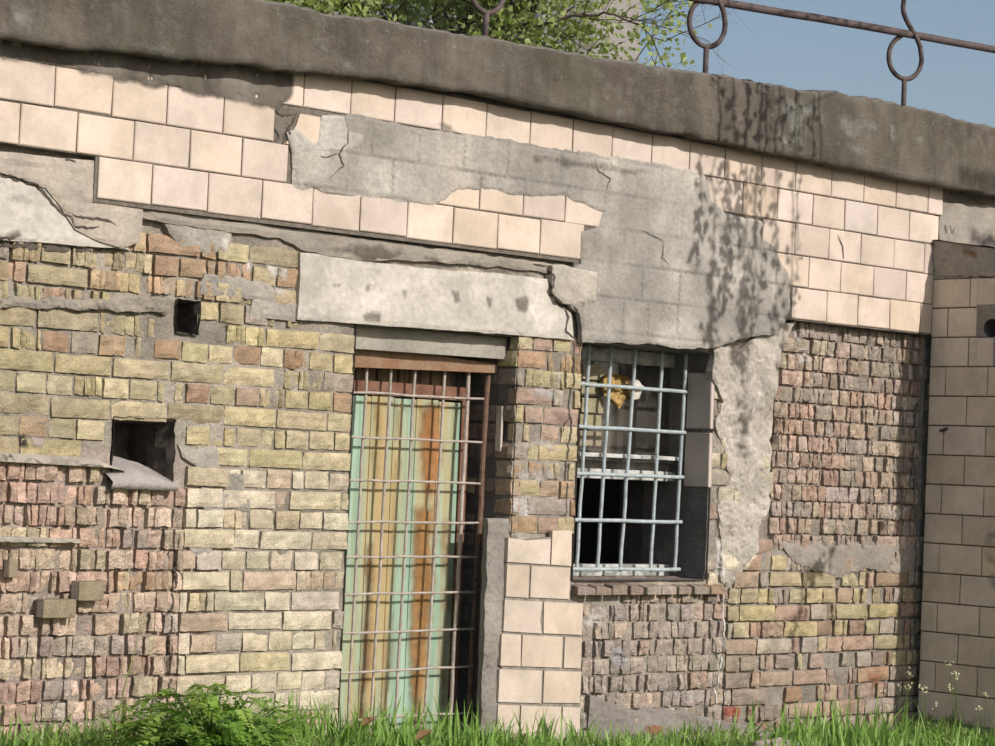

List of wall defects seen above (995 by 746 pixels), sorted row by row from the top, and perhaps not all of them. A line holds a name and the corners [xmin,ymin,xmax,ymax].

crack [0,173,121,253]
crack [320,128,349,176]
corrosion [421,407,440,492]
crack [533,263,578,525]
corrosion [360,550,374,718]
corrosion [410,509,435,722]